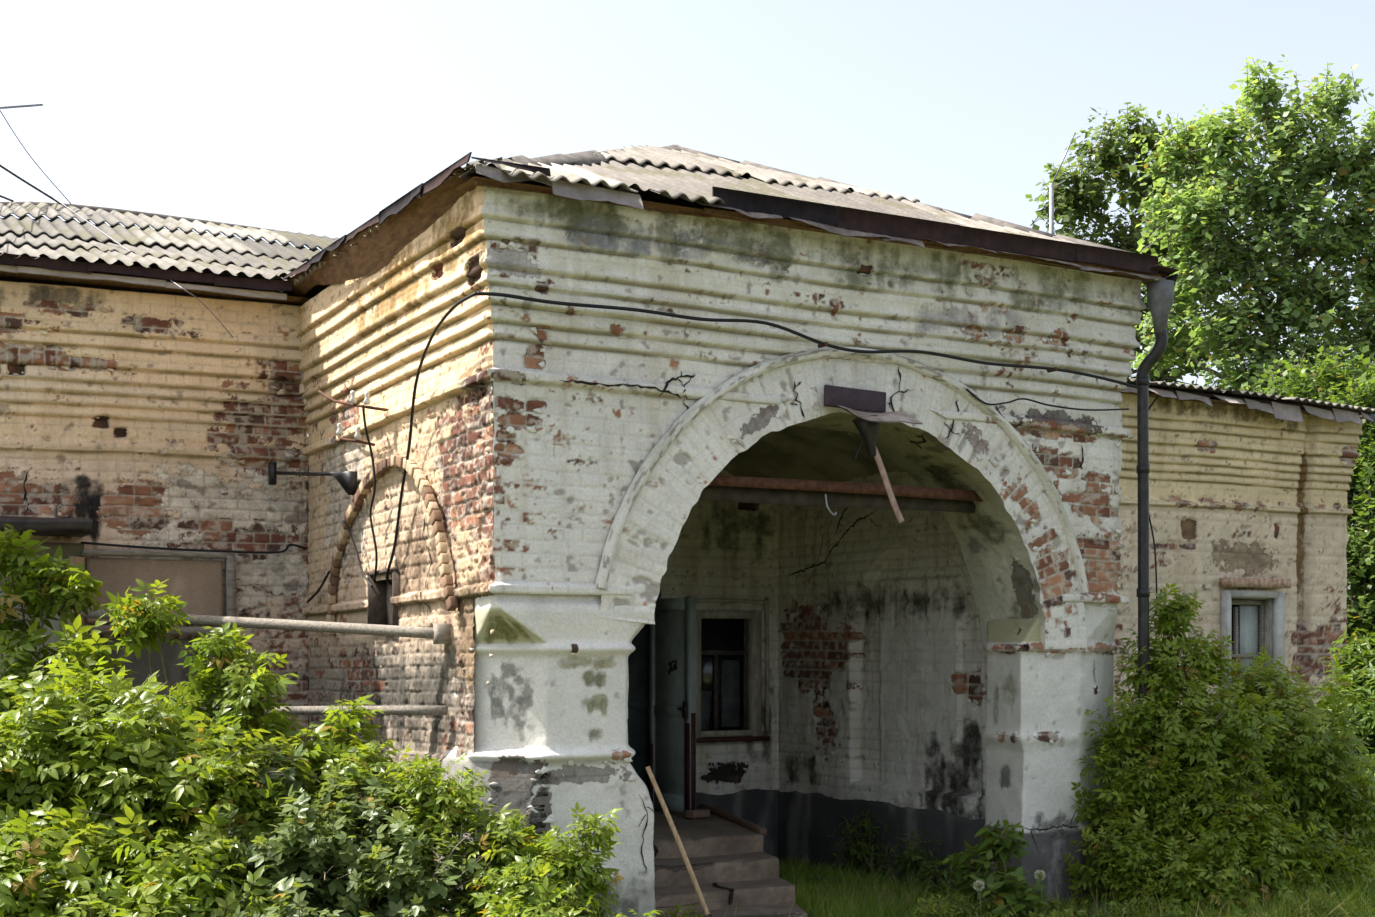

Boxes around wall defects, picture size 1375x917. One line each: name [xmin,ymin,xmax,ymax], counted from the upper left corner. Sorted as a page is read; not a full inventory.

leakage [565,199,789,282]
flaking render [0,300,203,378]
crack [560,371,696,409]
peeling [93,356,373,620]
flaking render [435,325,552,697]
crack [790,508,879,575]
flaking render [961,405,1135,658]
peeling [1149,495,1344,577]
mould [489,664,533,740]
flaking render [780,598,867,762]
leakage [919,722,985,819]
leakage [1001,766,1010,787]